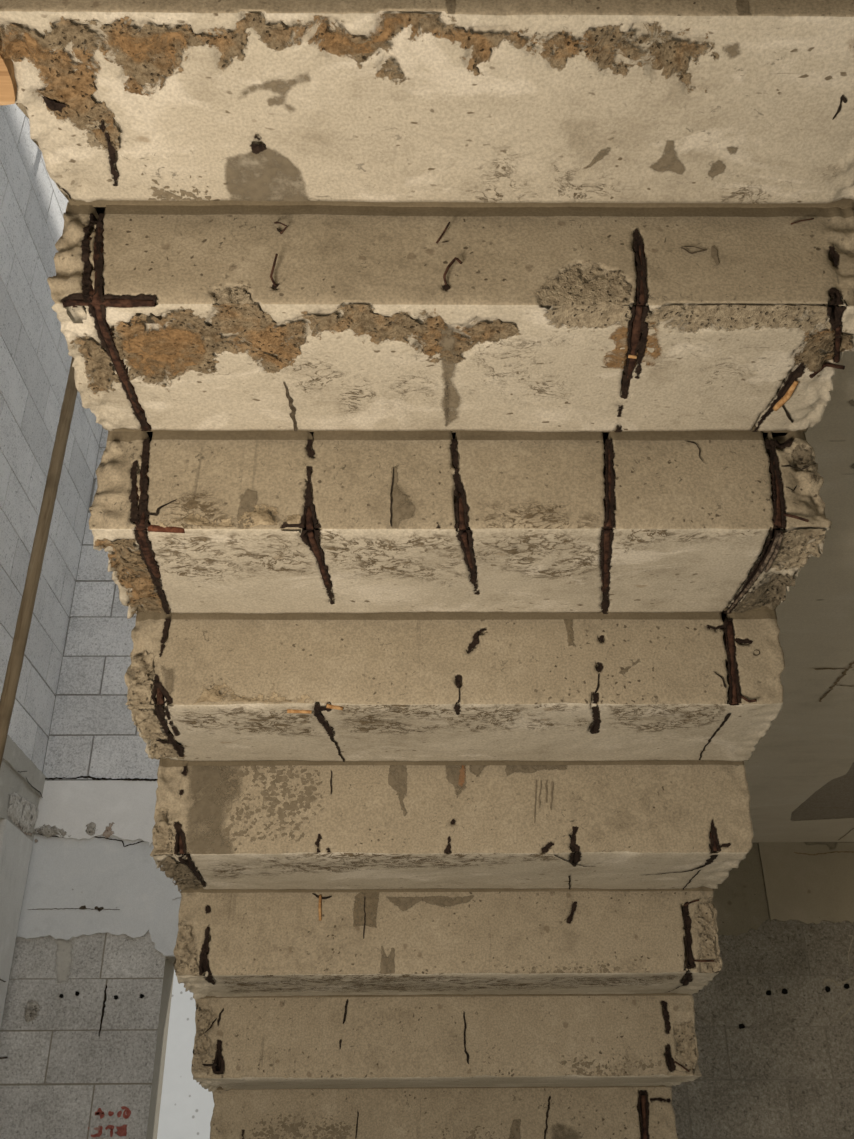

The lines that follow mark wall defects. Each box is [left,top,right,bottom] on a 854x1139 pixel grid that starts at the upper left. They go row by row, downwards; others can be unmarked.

spalling [0,13,739,150]
damp [226,141,309,202]
spalling [70,281,534,396]
spalling [534,260,854,377]
peeling [342,385,376,412]
spalling [94,535,308,615]
peeling [616,529,704,549]
spalling [732,529,826,613]